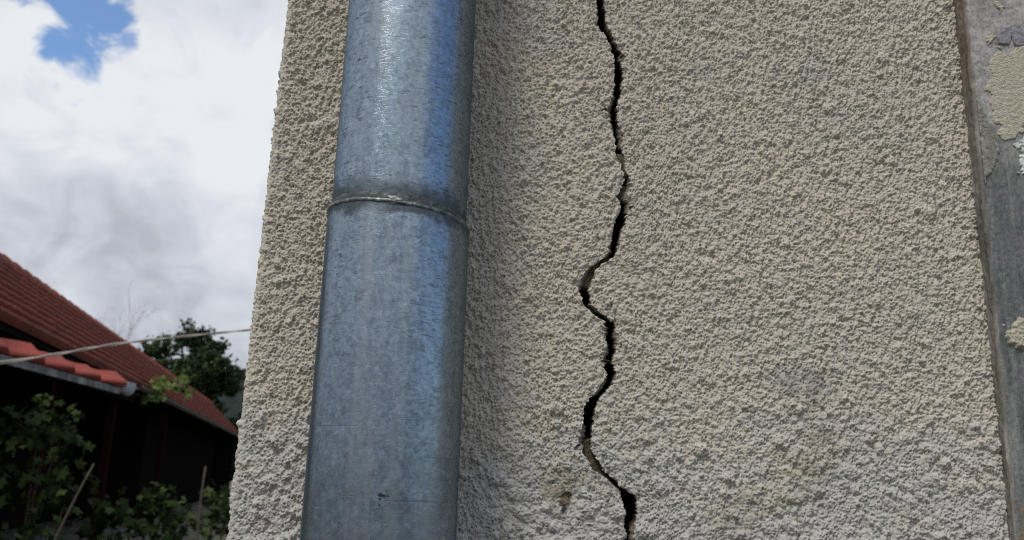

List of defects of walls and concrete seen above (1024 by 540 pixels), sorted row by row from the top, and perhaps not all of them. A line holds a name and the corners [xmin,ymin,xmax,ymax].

peeling [976,24,1024,185]
crack [575,0,638,540]
peeling [1002,317,1024,350]